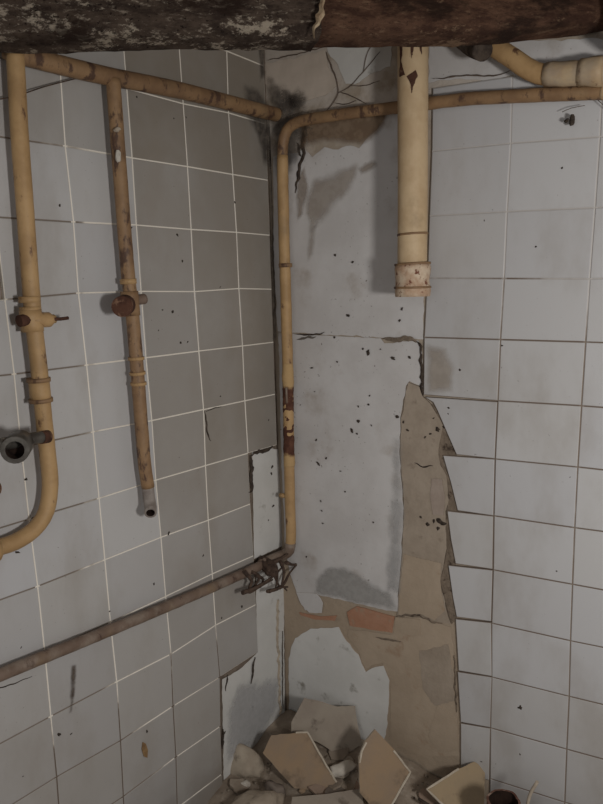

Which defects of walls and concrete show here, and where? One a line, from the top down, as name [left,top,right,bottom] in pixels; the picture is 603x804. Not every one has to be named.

crack [270,47,380,110]
damp [248,86,304,174]
damp [288,115,385,167]
damp [309,169,355,225]
peeling [222,114,460,804]
damp [318,504,399,606]
spalling [426,762,485,804]